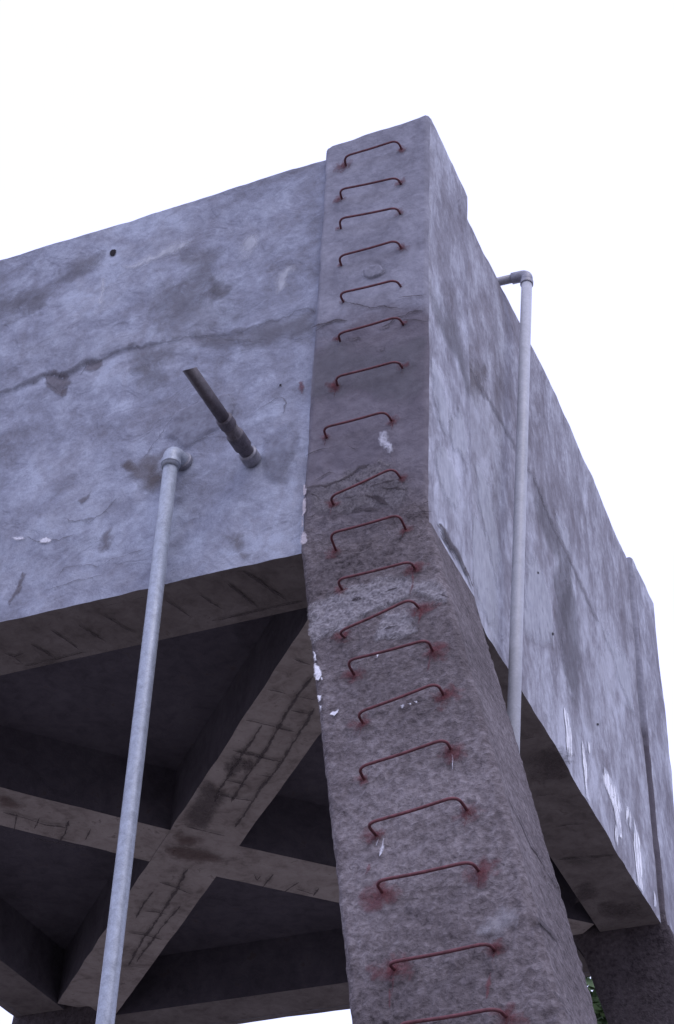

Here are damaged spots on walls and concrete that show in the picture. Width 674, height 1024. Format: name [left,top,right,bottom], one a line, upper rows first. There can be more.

spalling [301,460,406,544]
spalling [308,577,449,680]
damp [540,708,590,800]
efflorescence [603,768,657,907]